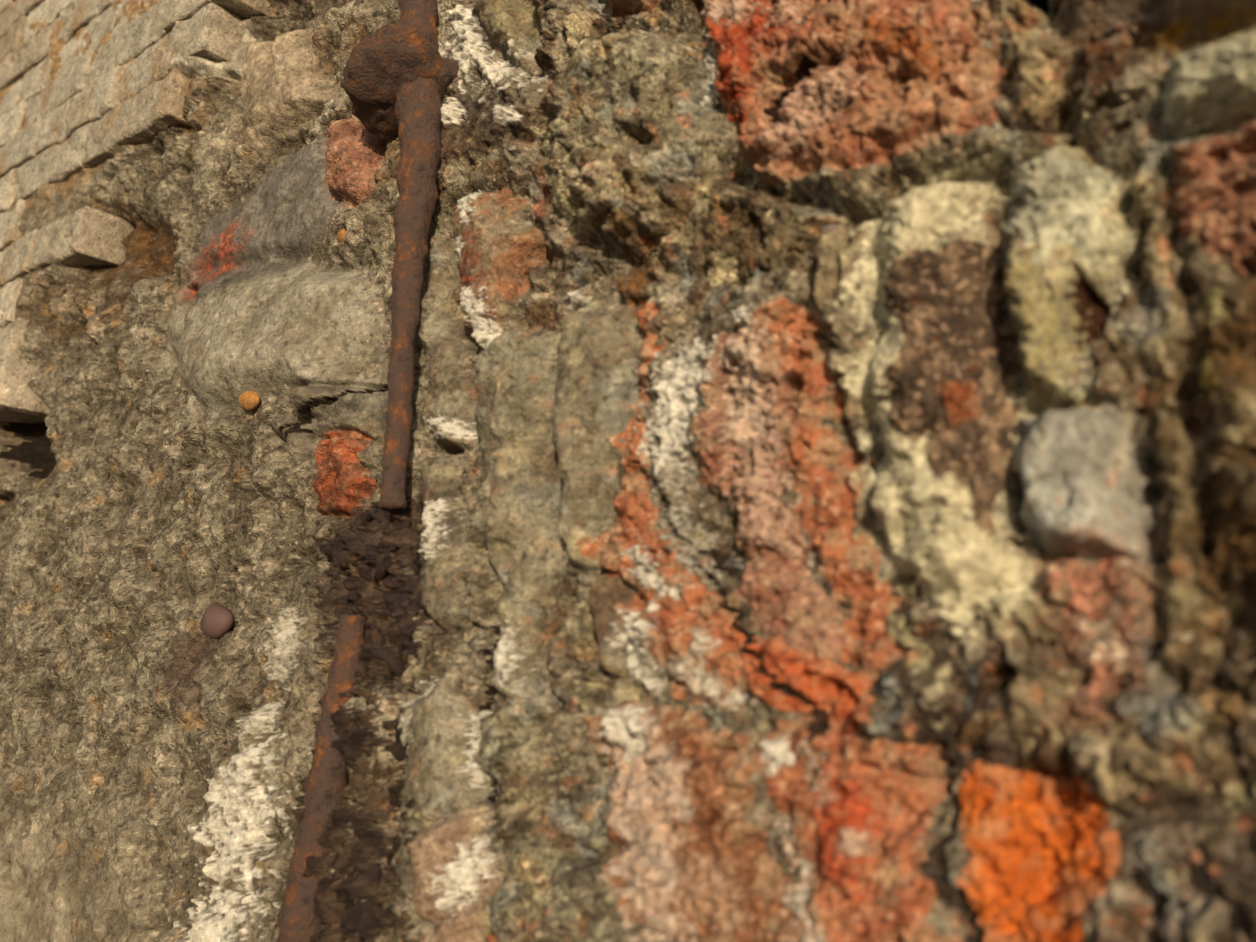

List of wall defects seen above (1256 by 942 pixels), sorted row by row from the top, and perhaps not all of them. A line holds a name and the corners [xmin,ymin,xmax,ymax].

leakage [438,5,552,128]
spalling [699,0,1008,186]
spalling [1027,0,1050,14]
spalling [1159,119,1256,279]
spalling [0,422,56,480]
spalling [881,238,1027,548]
spalling [1062,276,1111,352]
rust [305,494,447,688]
leakage [585,303,809,942]
crack [660,495,831,761]
spalling [575,295,1122,942]
leakage [164,607,308,942]